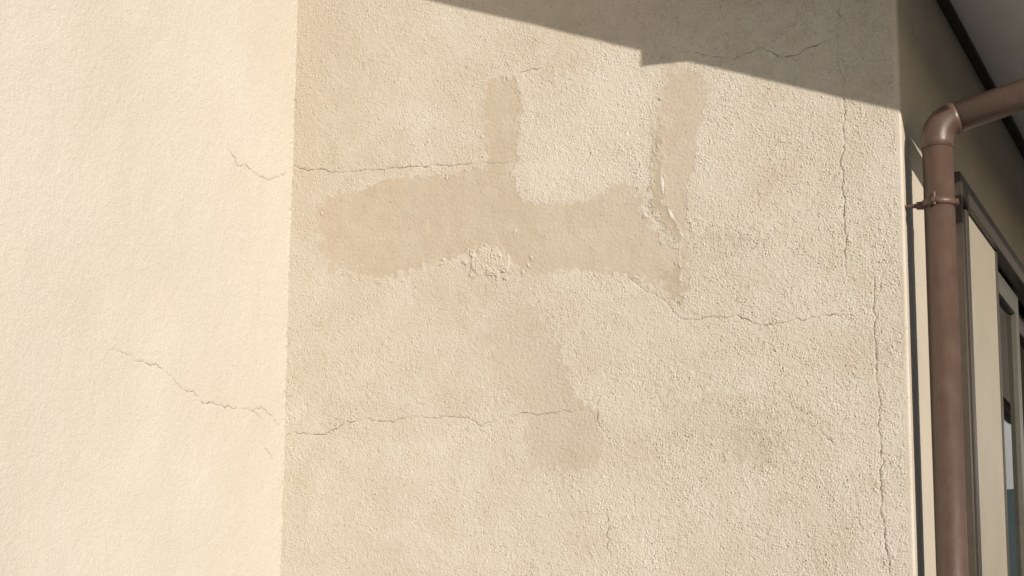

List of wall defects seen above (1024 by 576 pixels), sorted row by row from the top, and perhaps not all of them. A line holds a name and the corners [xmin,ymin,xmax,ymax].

flaking render [303,54,713,297]
damp [653,265,691,305]